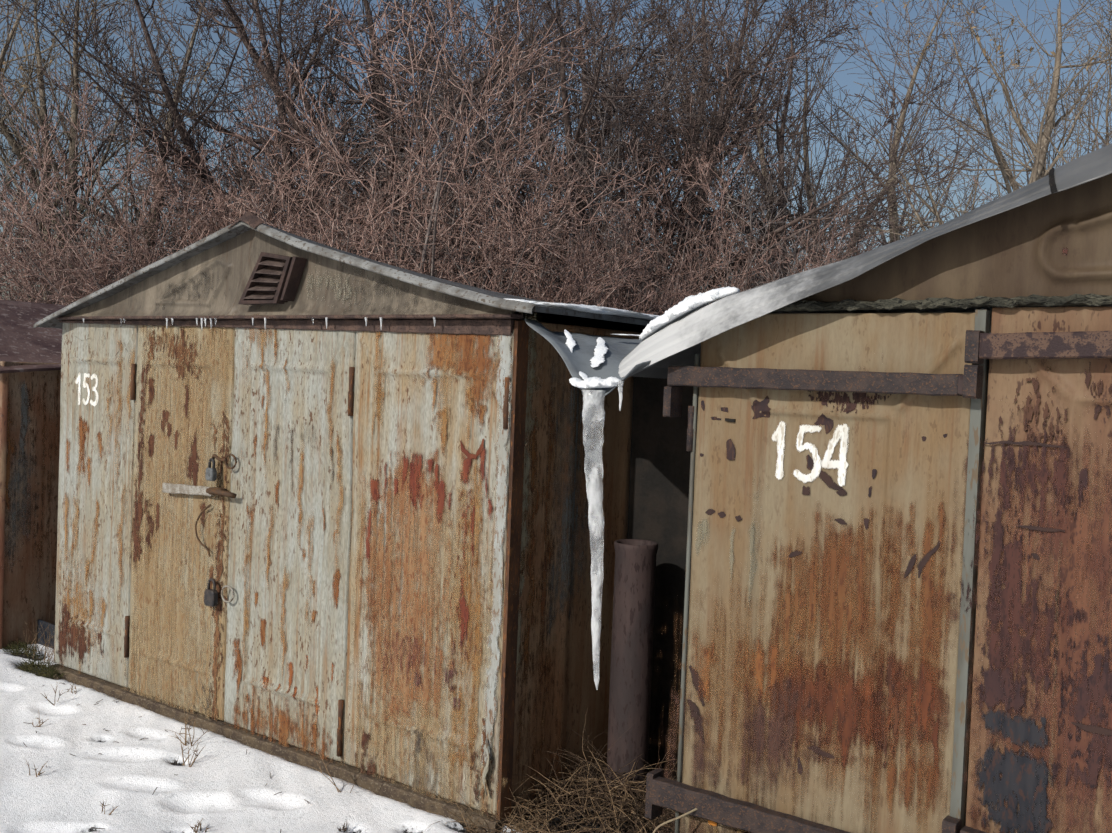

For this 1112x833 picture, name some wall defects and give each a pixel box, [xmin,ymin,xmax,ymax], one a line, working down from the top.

corrosion [56,493,107,662]
corrosion [5,342,179,585]
corrosion [186,432,199,486]
corrosion [200,412,332,760]
corrosion [246,328,290,460]
corrosion [298,361,344,623]
corrosion [355,332,505,815]